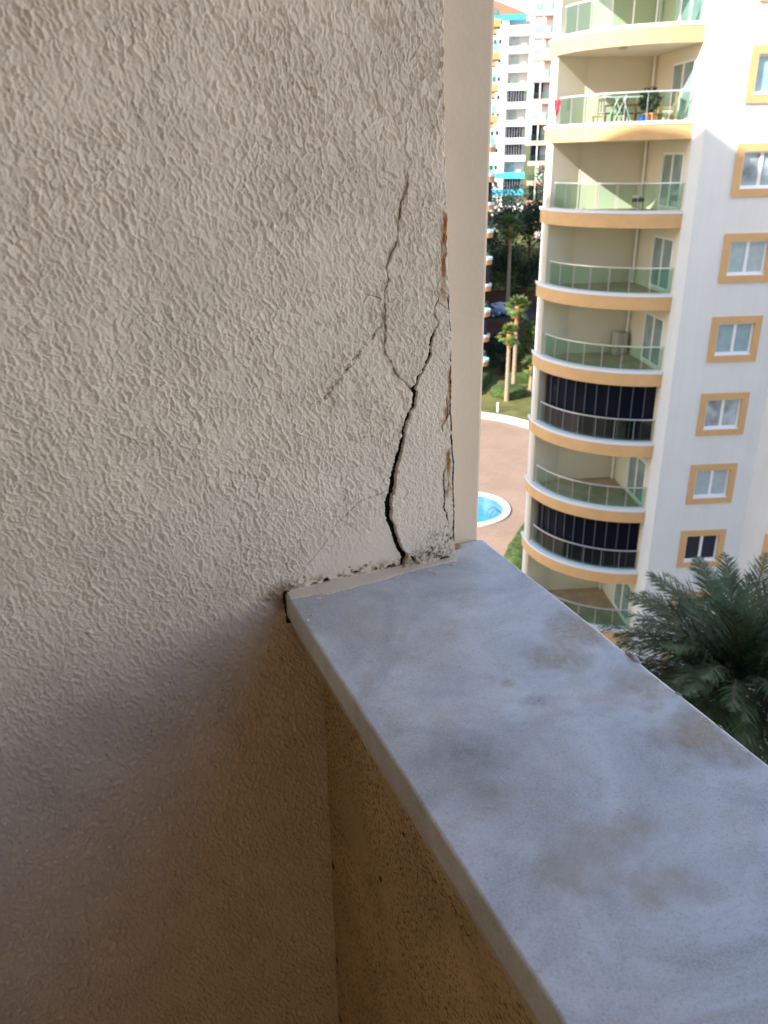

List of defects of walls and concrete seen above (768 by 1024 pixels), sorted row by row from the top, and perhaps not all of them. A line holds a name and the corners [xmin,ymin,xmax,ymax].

crack [318,199,455,565]